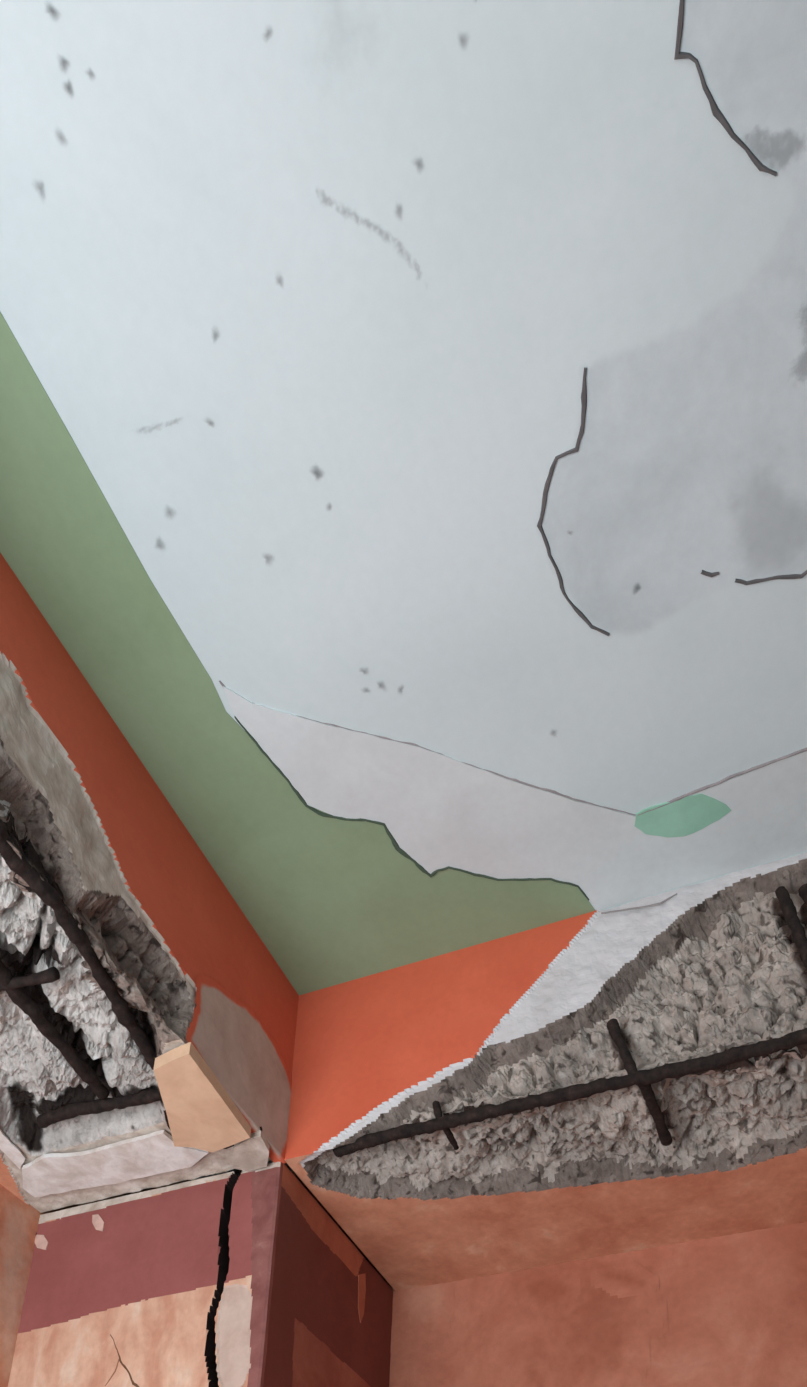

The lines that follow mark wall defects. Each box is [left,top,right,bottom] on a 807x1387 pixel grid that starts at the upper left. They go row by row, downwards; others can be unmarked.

spalling [0,652,807,1232]
crack [204,1126,262,1387]